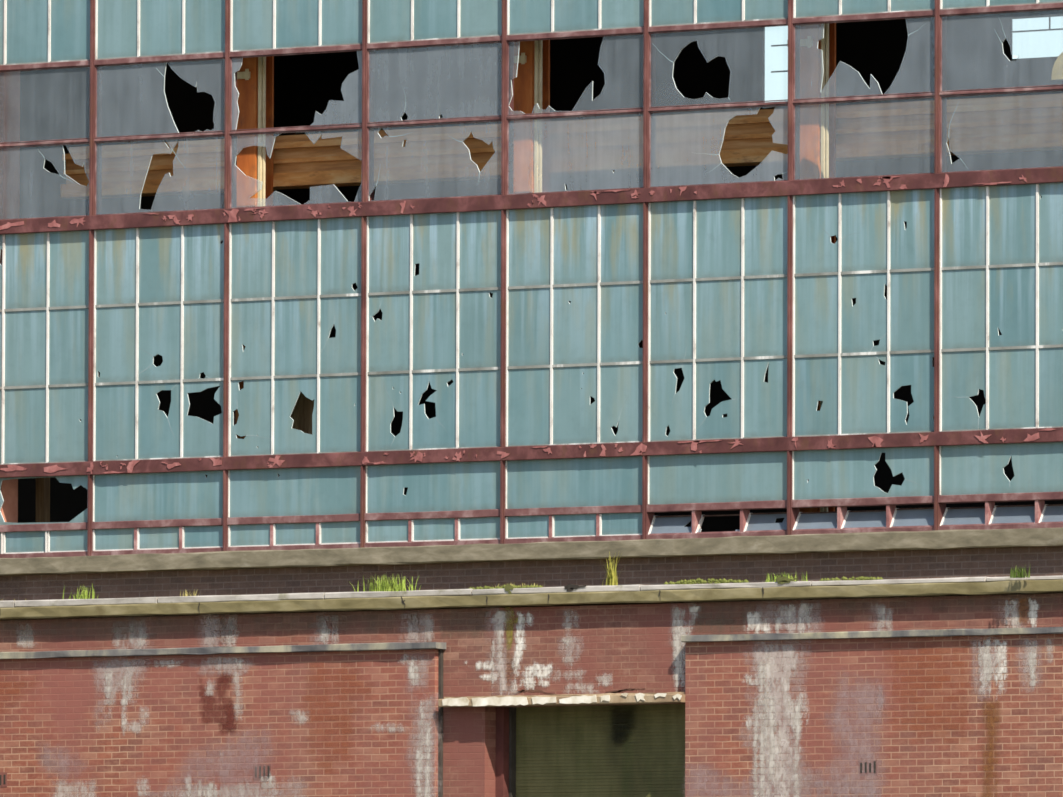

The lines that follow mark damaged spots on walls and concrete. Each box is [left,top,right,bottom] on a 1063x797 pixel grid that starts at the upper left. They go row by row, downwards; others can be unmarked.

peeling [833,176,907,189]
peeling [48,217,85,227]
peeling [223,208,268,222]
peeling [1024,428,1056,441]
peeling [579,443,647,457]
peeling [86,460,140,474]
water stain [1006,599,1038,627]
water stain [469,611,552,694]
water stain [673,604,732,687]
water stain [973,640,1007,694]
water stain [96,661,146,731]
water stain [746,603,818,797]